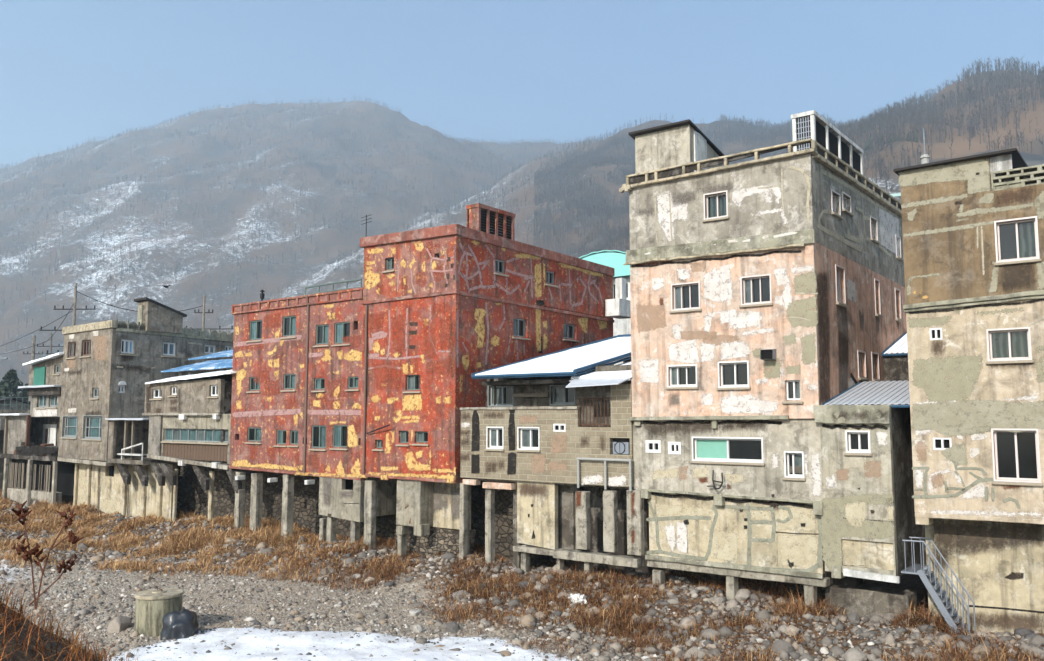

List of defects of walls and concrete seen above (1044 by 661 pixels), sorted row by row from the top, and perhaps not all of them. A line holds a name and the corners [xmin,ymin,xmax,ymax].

leakage [997,189,1033,205]
peeling [712,232,798,245]
peeling [435,301,501,404]
crack [367,243,604,370]
peeling [501,248,548,351]
peeling [637,261,819,383]
leakage [909,263,1044,314]
peeling [231,318,470,484]
peeling [700,358,782,427]
peeling [581,474,626,487]
crack [912,465,1020,509]
crack [646,500,894,572]